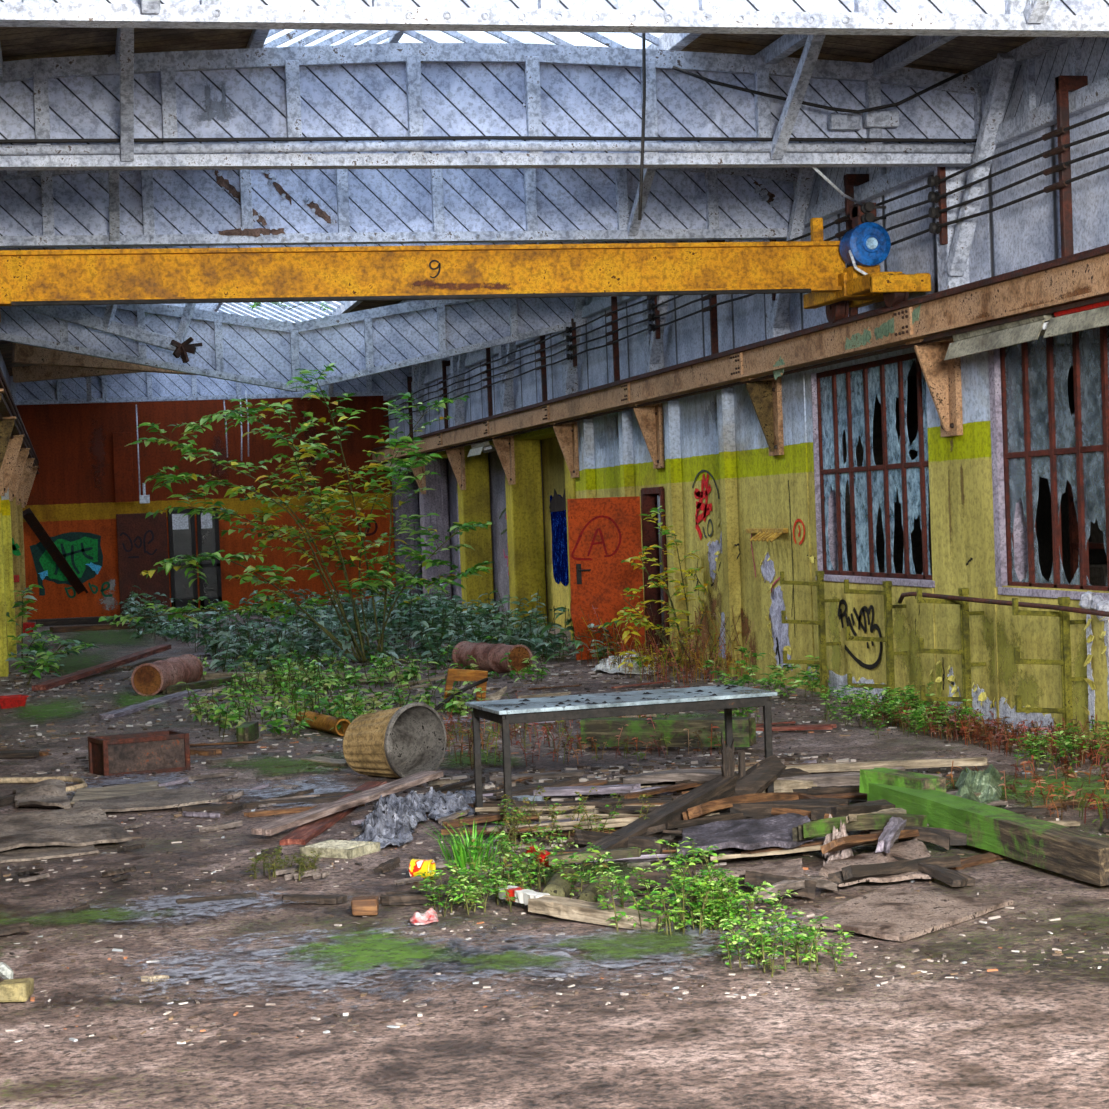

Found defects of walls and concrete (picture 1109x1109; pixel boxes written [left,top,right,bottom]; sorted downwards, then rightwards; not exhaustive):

rust [413,279,509,291]
peeling [760,550,792,671]
flaking render [805,666,887,704]
peeling [1082,614,1109,732]